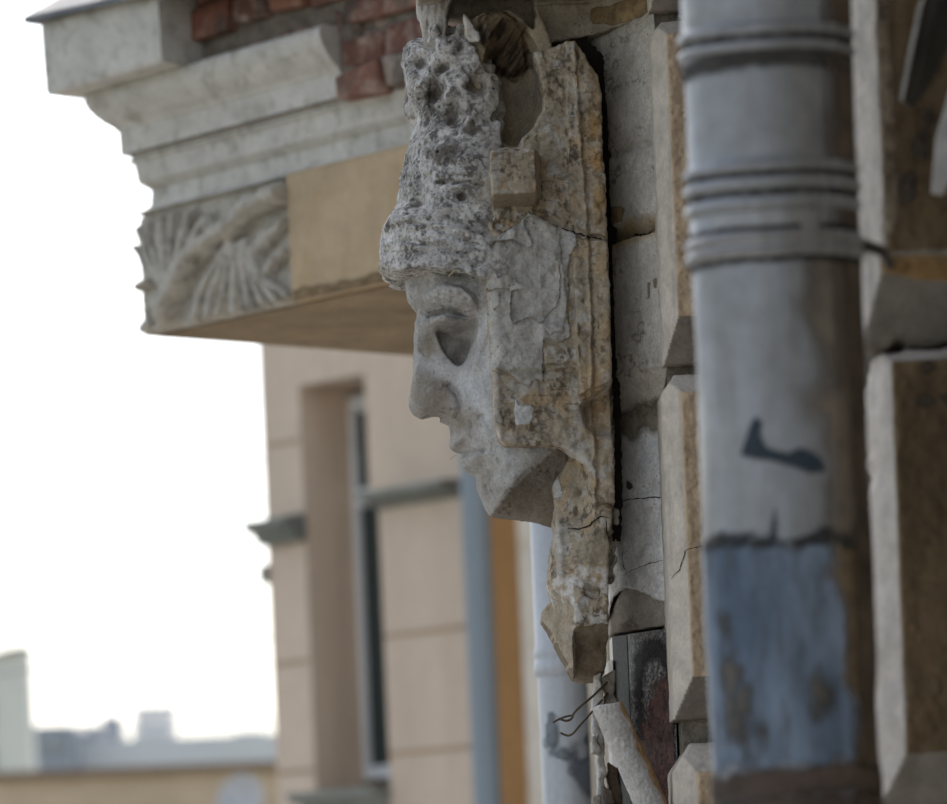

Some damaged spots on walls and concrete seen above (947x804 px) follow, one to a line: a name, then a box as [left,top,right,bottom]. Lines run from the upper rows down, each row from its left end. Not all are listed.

peeling [486,213,577,387]
peeling [514,399,534,425]
peeling [552,476,562,498]